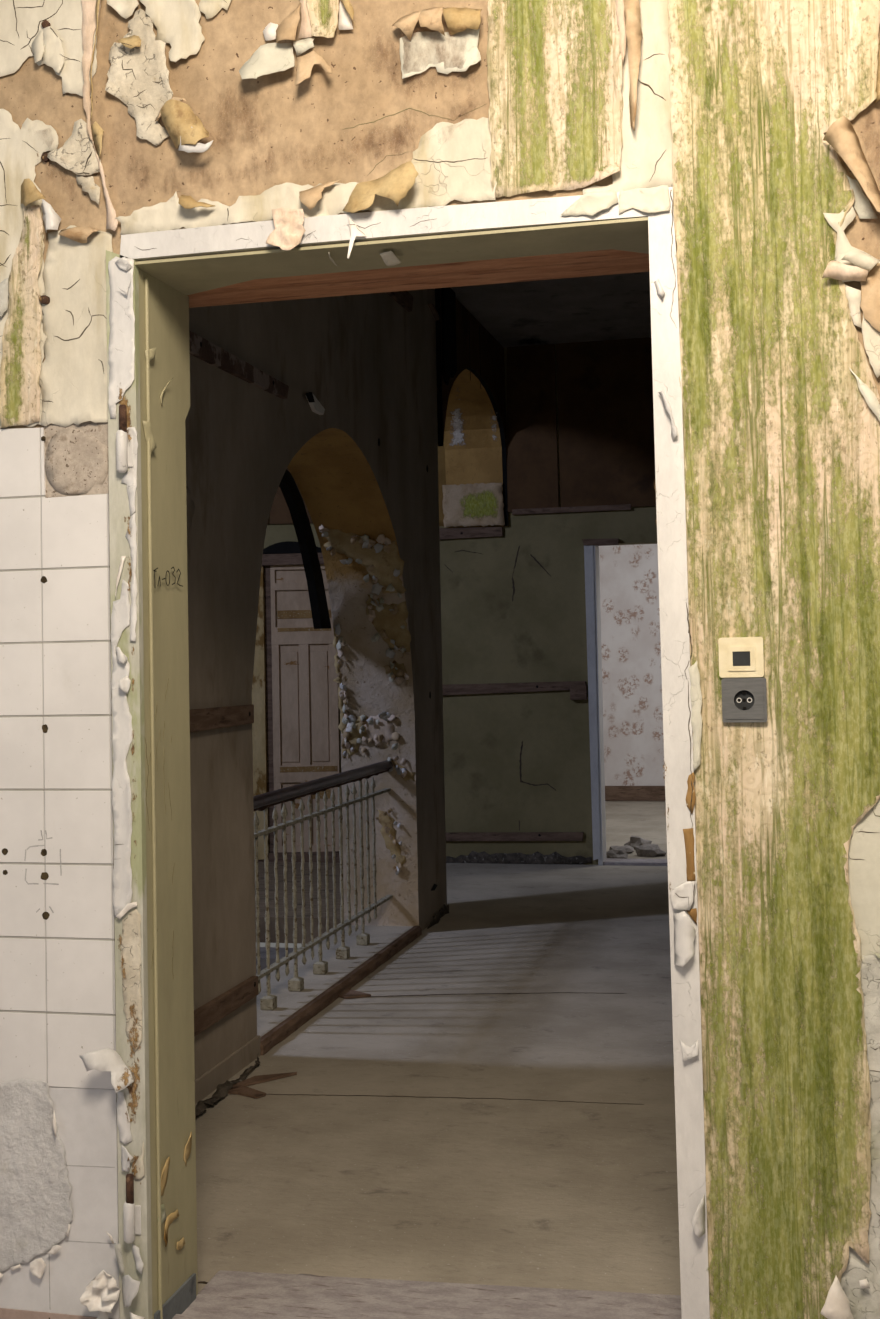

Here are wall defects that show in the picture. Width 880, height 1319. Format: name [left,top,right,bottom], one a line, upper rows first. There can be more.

crack [1,0,80,62]
peeling [0,0,231,153]
peeling [239,3,332,85]
peeling [392,7,482,79]
crack [0,138,39,267]
crack [55,279,107,372]
damp [685,256,711,395]
peeling [822,175,880,421]
damp [795,378,803,494]
peeling [0,109,497,1180]
damp [800,544,830,803]
damp [795,859,836,1207]